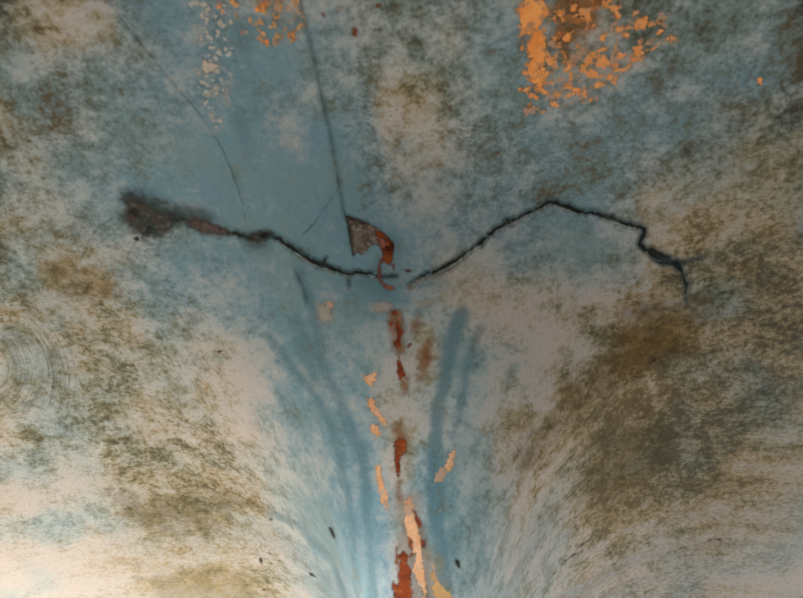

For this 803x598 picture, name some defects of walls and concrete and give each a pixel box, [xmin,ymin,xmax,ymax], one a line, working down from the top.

peeling [188,0,306,128]
peeling [514,0,679,116]
leakage [120,193,197,241]
spalling [345,216,394,265]
crack [227,200,698,302]
corrosion [389,310,417,389]
corrosion [393,424,406,477]
corrosion [392,547,413,598]